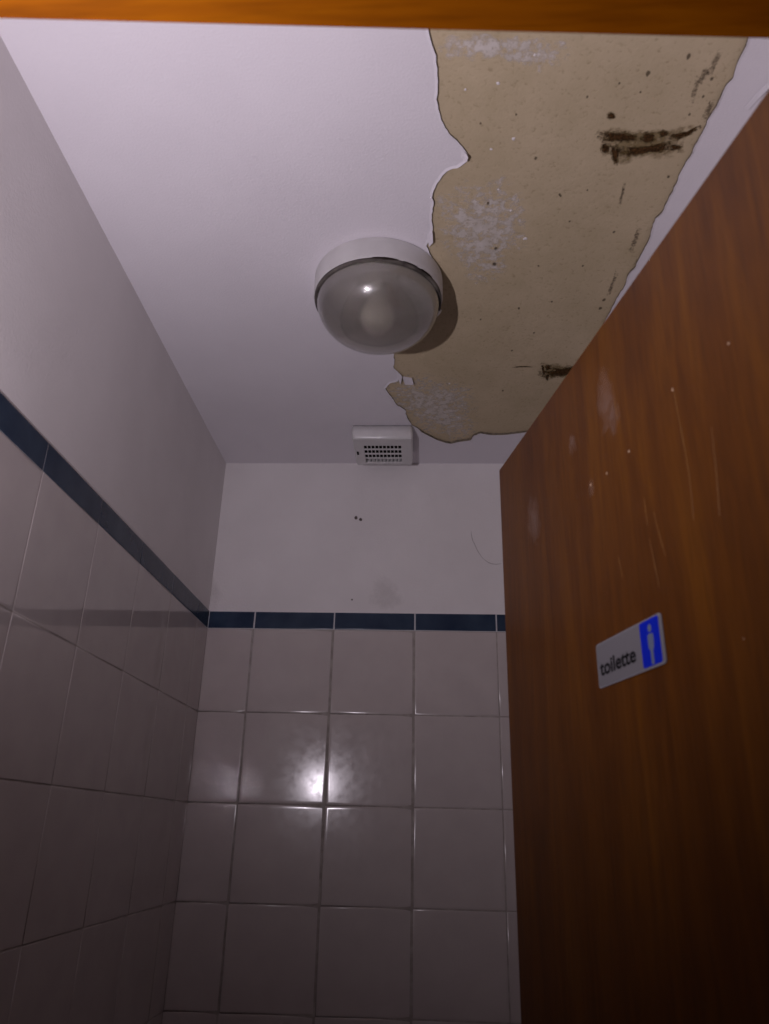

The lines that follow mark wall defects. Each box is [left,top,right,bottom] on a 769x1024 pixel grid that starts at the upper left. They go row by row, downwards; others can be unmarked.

peeling [384,29,751,444]
peeling [744,83,769,110]